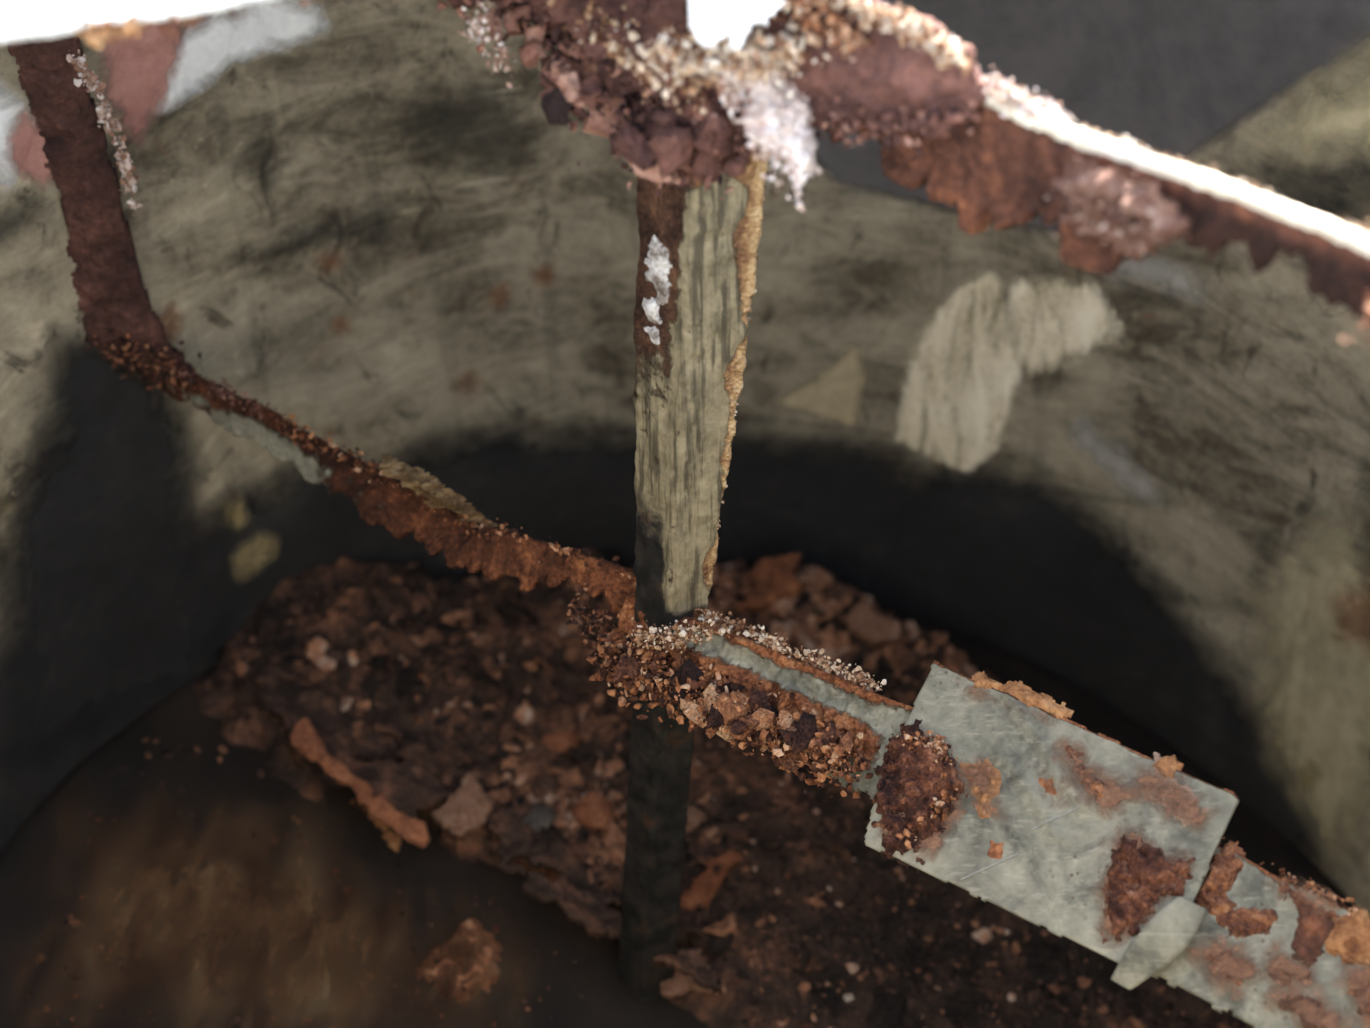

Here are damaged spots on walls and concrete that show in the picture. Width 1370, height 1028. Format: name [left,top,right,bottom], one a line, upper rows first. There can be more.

rust [102,18,183,134]
rust [11,113,51,184]
rust [1029,178,1188,254]
rust [379,452,499,527]
rust [965,671,1074,720]
rust [870,719,1001,873]
rust [1038,739,1209,829]
rust [987,840,1004,859]
rust [1098,832,1370,1028]